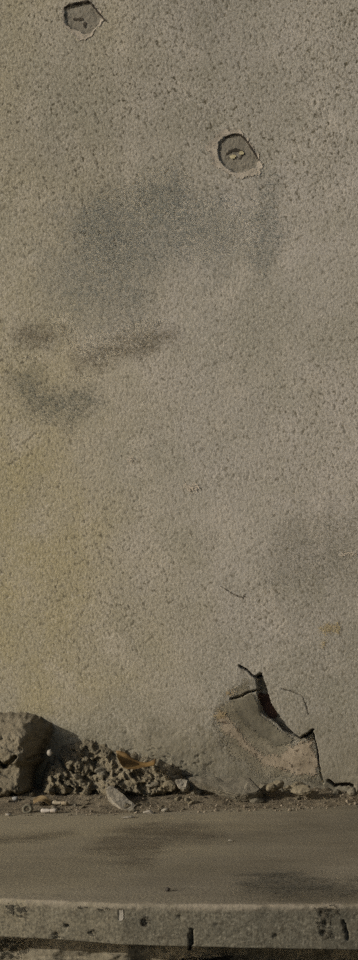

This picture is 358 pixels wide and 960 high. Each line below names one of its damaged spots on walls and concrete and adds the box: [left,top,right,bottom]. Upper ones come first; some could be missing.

spalling [62,0,107,41]
spalling [204,129,263,179]
spalling [209,669,319,785]